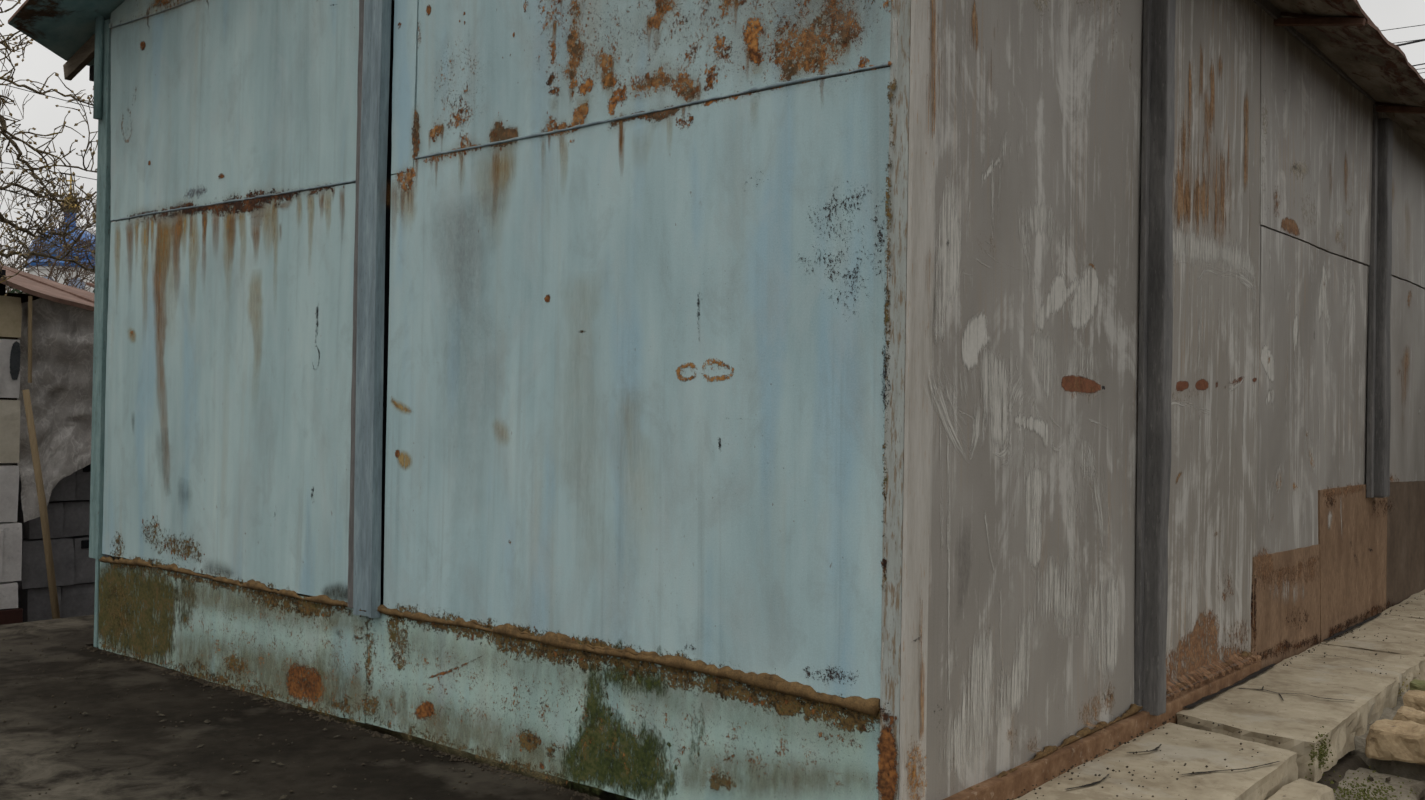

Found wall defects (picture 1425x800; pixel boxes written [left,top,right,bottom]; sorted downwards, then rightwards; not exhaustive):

corrosion [395,12,518,194]
corrosion [502,0,894,151]
corrosion [1172,46,1249,238]
corrosion [127,183,344,386]
corrosion [1061,375,1105,396]
corrosion [1171,377,1257,413]
corrosion [100,516,944,800]